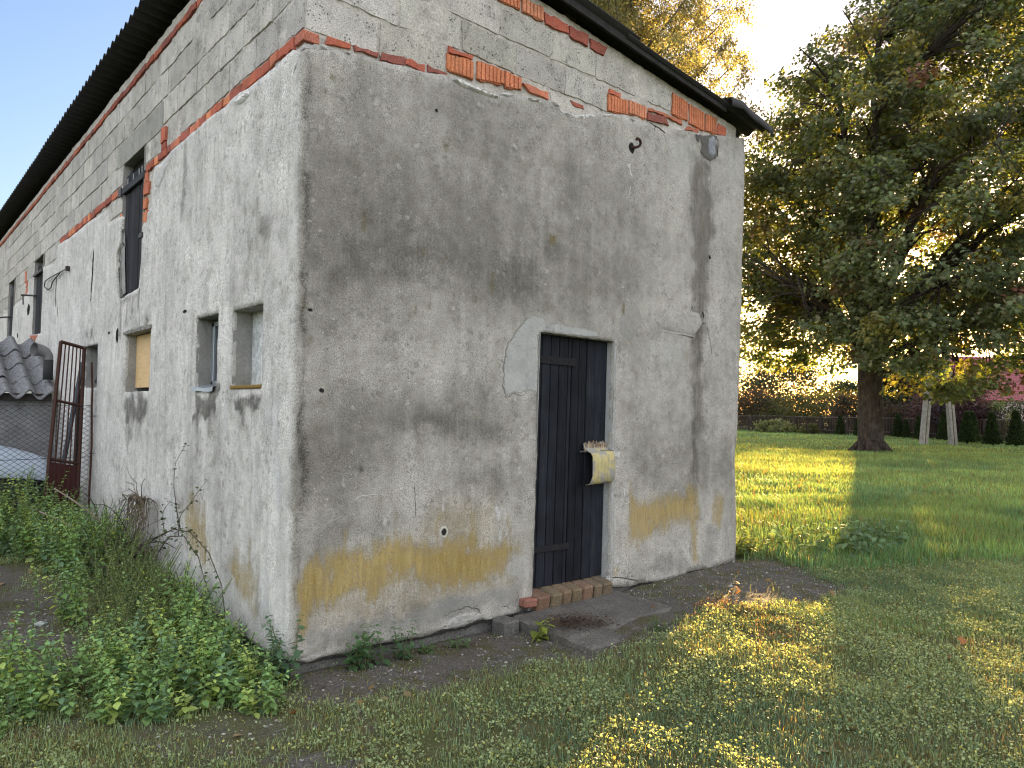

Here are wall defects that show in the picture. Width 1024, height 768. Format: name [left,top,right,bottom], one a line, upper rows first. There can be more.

flaking render [293,44,352,73]
flaking render [451,76,514,98]
water stain [693,155,714,472]
water stain [126,395,146,421]
water stain [192,384,220,420]
water stain [235,396,260,413]
water stain [612,488,699,539]
water stain [299,533,511,627]